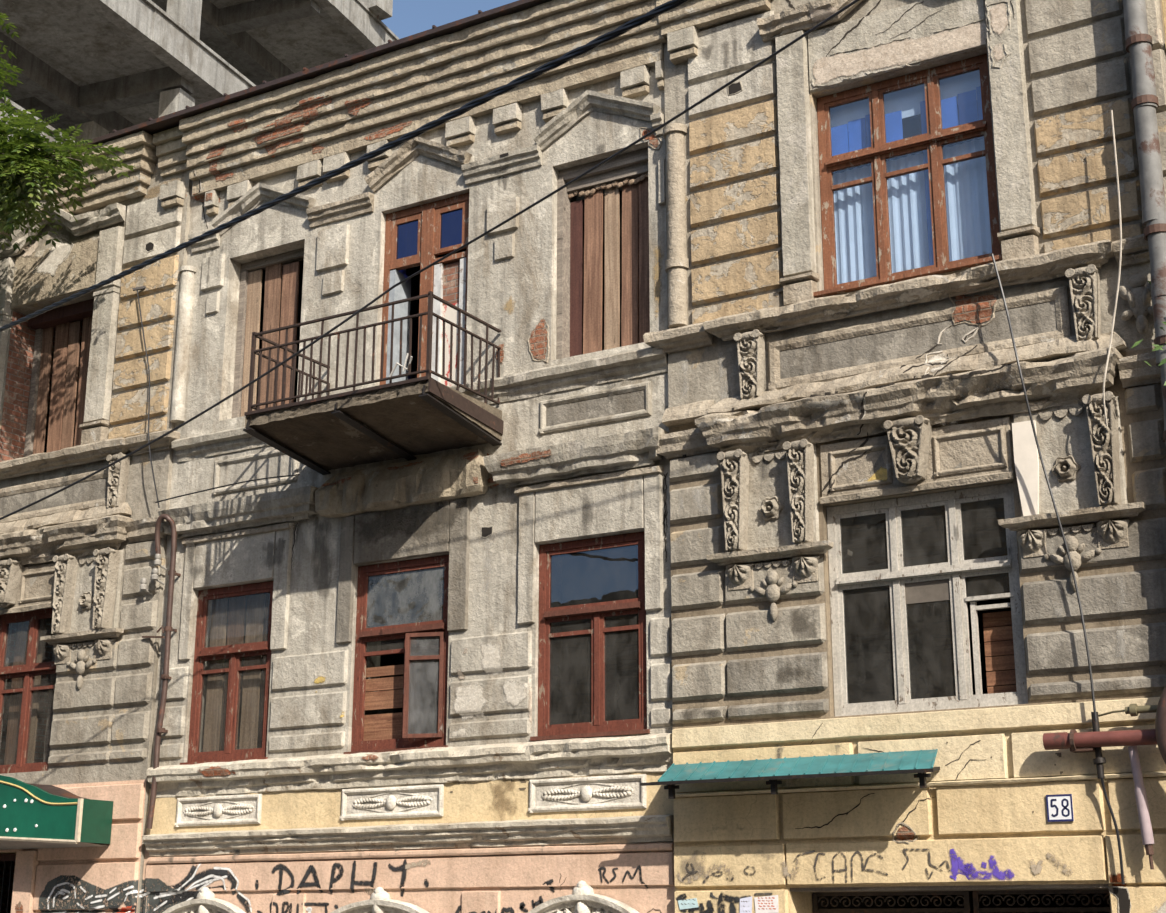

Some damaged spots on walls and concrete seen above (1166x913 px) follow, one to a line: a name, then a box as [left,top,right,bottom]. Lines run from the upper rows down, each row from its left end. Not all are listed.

crack [826,0,943,57]
flaking render [227,95,372,158]
flaking render [186,143,234,202]
flaking render [528,319,550,363]
crack [900,326,979,376]
flaking render [896,286,1000,375]
crack [822,390,872,495]
flaking render [450,670,487,739]
flaking render [463,642,532,730]
crack [795,793,875,829]
crack [895,740,986,829]